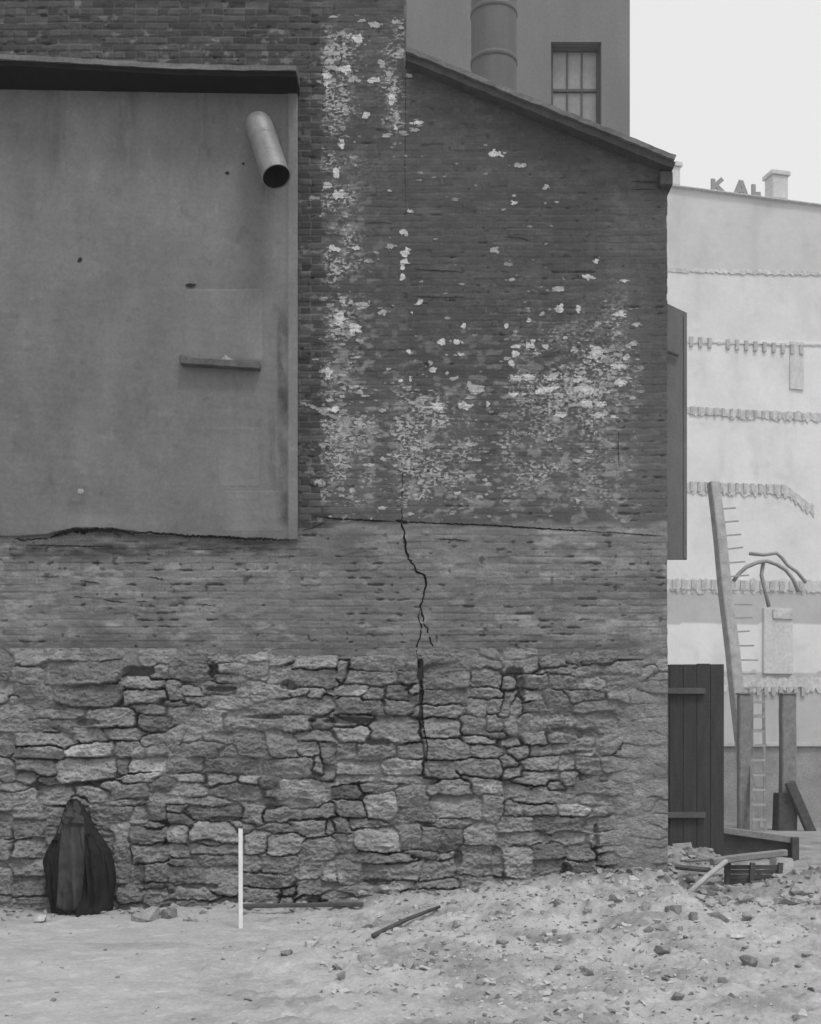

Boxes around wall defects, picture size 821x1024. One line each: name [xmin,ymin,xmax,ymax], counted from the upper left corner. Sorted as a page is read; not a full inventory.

peeling [309,14,645,523]
crack [15,436,657,767]